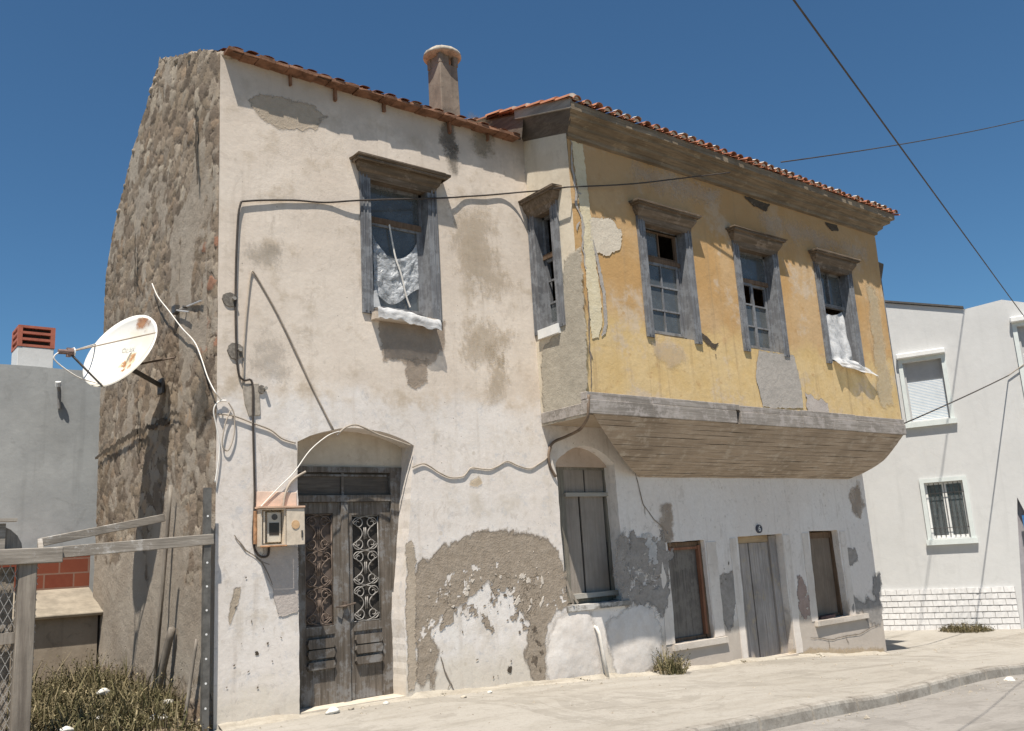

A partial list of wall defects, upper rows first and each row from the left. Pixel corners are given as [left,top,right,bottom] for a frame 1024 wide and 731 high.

peeling [249,94,327,131]
peeling [541,140,622,424]
peeling [756,350,829,412]
peeling [405,529,570,691]
peeling [613,530,674,620]
spalling [720,562,736,632]
peeling [797,575,811,619]